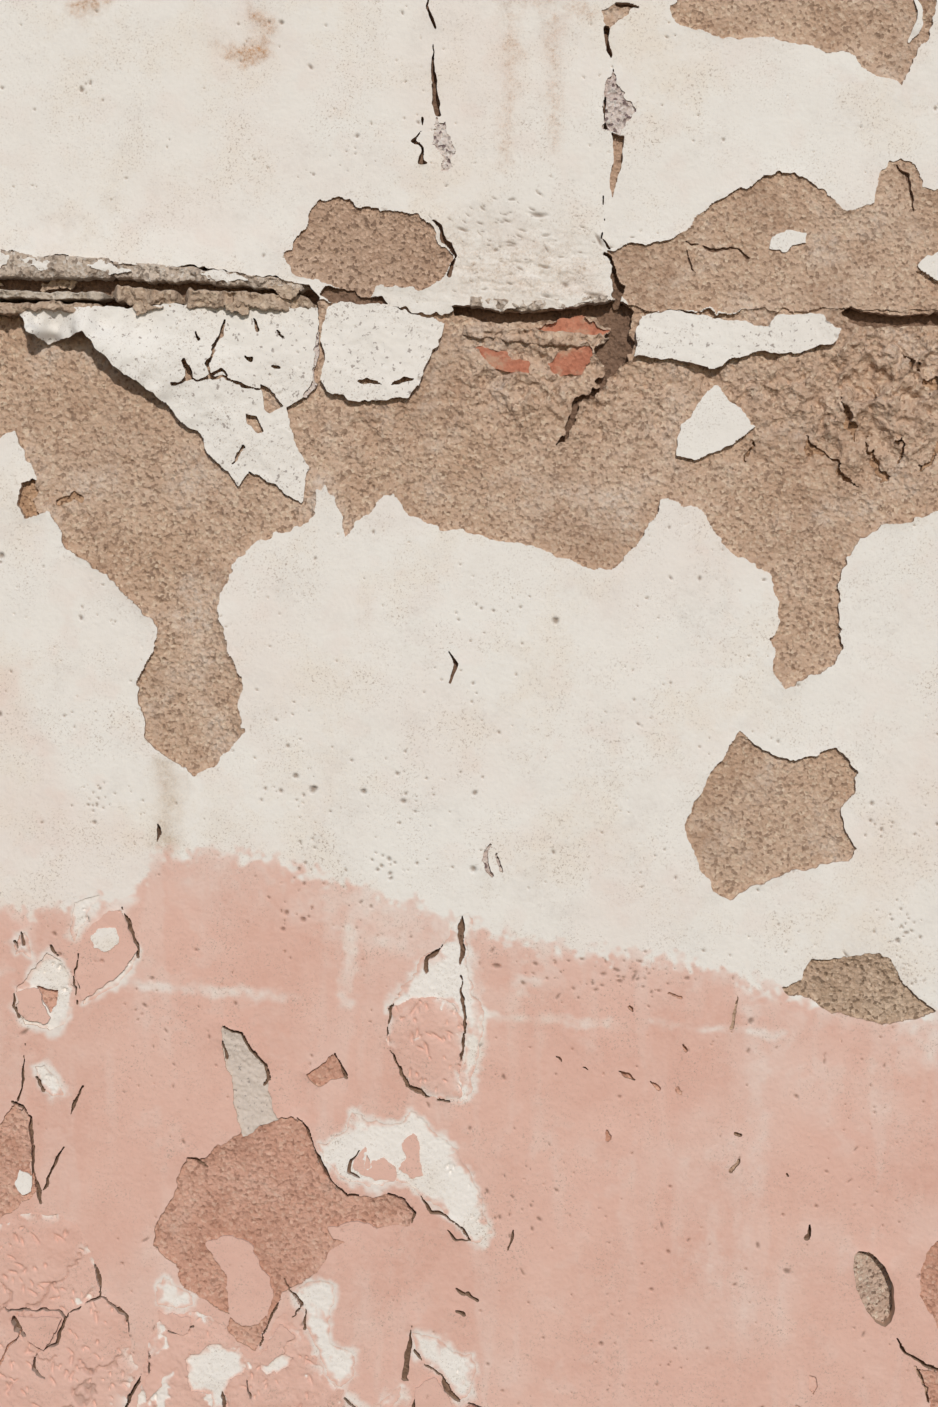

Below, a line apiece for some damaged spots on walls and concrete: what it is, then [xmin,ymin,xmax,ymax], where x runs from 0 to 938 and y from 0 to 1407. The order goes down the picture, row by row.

crack [412,0,456,171]
crack [601,4,636,250]
spalling [670,0,937,85]
crack [433,221,457,278]
spalling [0,159,938,776]
spalling [685,731,858,900]
spalling [782,953,935,1024]
spalling [0,1063,84,1218]
spalling [137,1026,493,1407]
spalling [920,1241,938,1328]